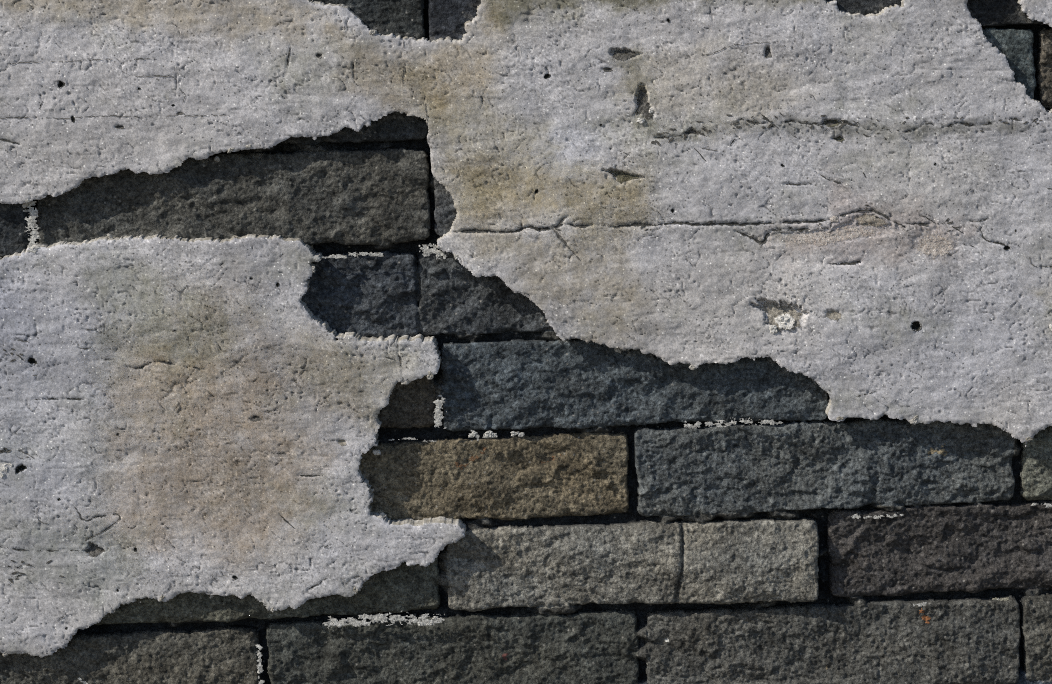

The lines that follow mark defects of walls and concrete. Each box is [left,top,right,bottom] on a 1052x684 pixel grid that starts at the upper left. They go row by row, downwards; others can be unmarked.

flaking render [308,0,481,42]
flaking render [824,0,905,17]
crack [651,111,1043,145]
crack [455,204,1006,260]
spalling [917,230,954,259]
crack [829,259,861,267]
flaking render [0,233,442,379]
spalling [758,302,802,334]
spalling [826,311,841,320]
flaking render [358,412,466,533]